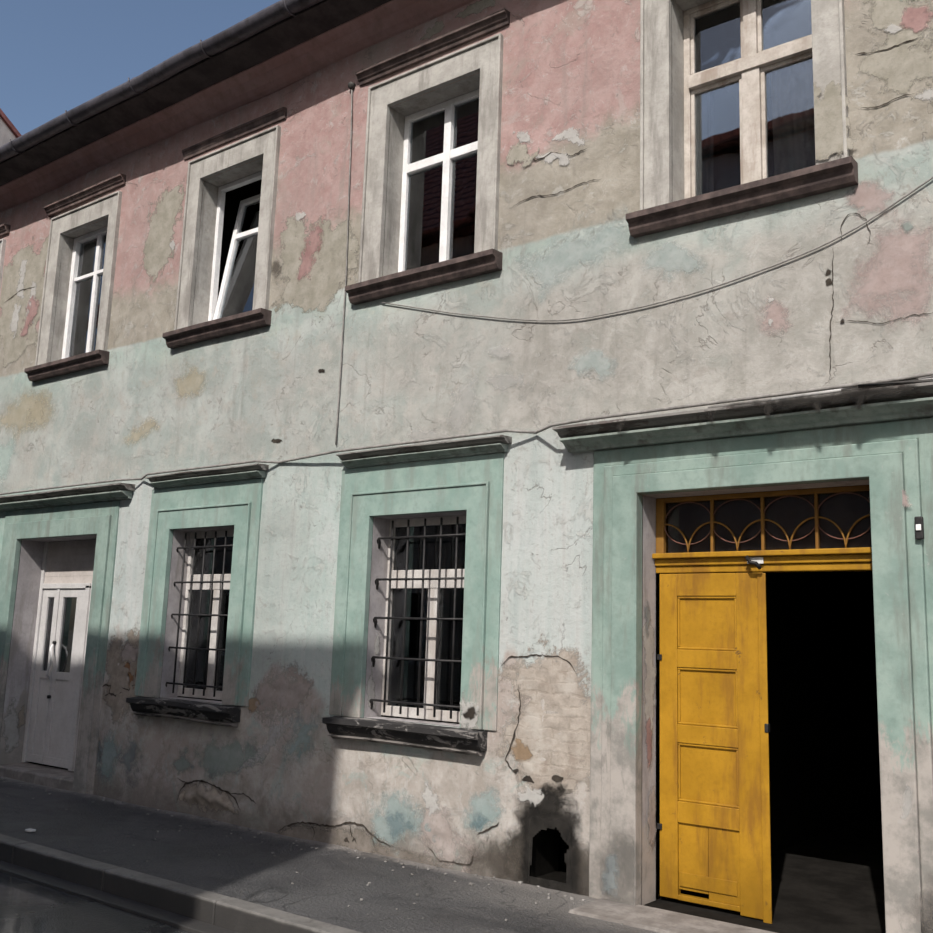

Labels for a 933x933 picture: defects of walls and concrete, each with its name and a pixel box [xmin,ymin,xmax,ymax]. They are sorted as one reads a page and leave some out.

peeling [855,0,933,109]
peeling [506,131,569,168]
peeling [552,127,585,146]
peeling [814,81,857,160]
crack [516,179,600,205]
crack [829,213,931,376]
peeling [103,629,143,724]
spalling [496,635,591,805]
crack [177,779,255,808]
damp [531,784,564,815]
crack [279,821,389,846]